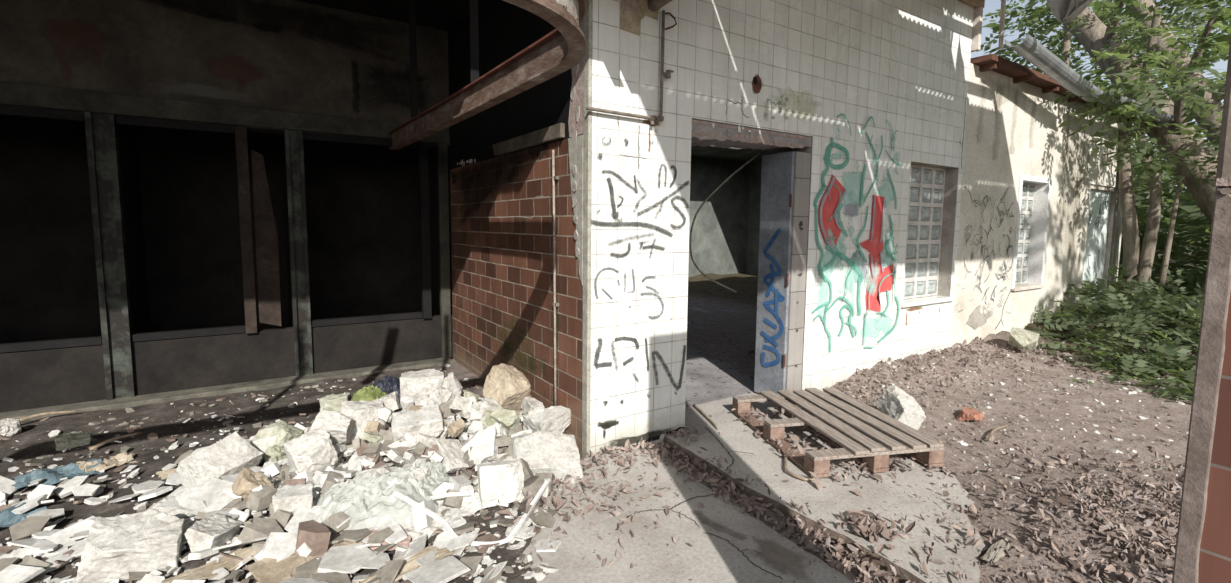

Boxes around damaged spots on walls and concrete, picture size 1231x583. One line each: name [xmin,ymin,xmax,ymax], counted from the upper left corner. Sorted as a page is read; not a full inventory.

spalling [620,0,659,36]